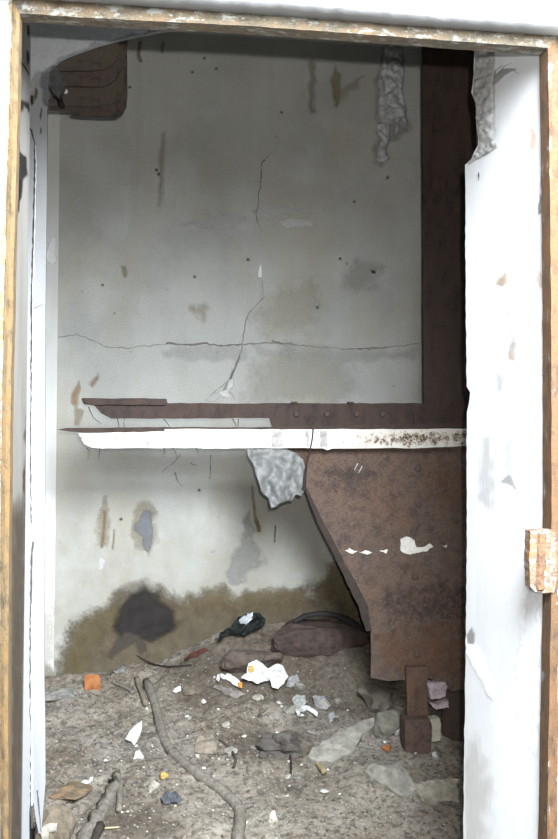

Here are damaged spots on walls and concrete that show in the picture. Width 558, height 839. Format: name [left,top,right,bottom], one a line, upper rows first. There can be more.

spalling [468,51,496,163]
crack [256,151,273,226]
crack [58,279,418,402]
damp [45,517,363,677]